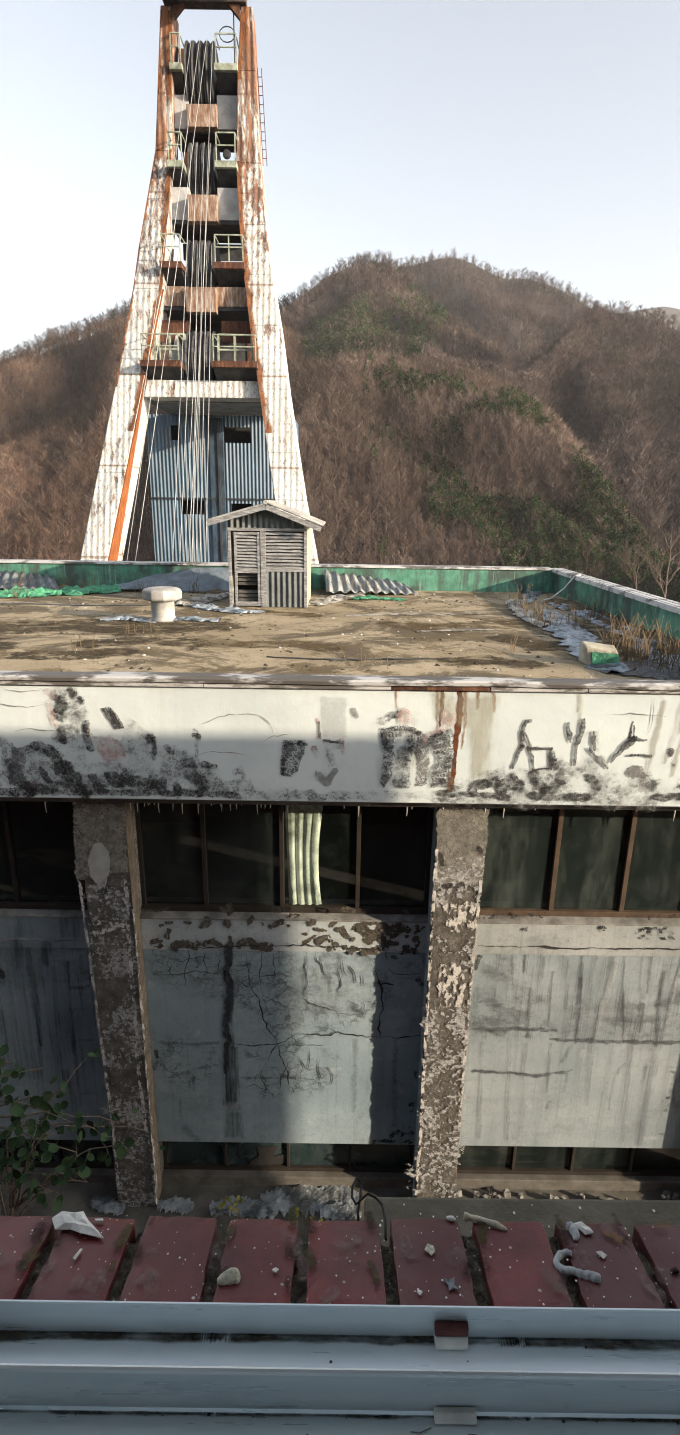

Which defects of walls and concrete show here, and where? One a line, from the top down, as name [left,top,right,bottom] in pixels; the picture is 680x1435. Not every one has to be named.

rust [157,10,172,108]
rust [238,11,247,79]
rust [115,148,172,431]
rust [236,160,273,433]
peeling [311,720,344,786]
rust [436,691,496,791]
leakage [223,944,240,1137]
peeling [72,802,490,1207]
crack [150,943,421,1096]